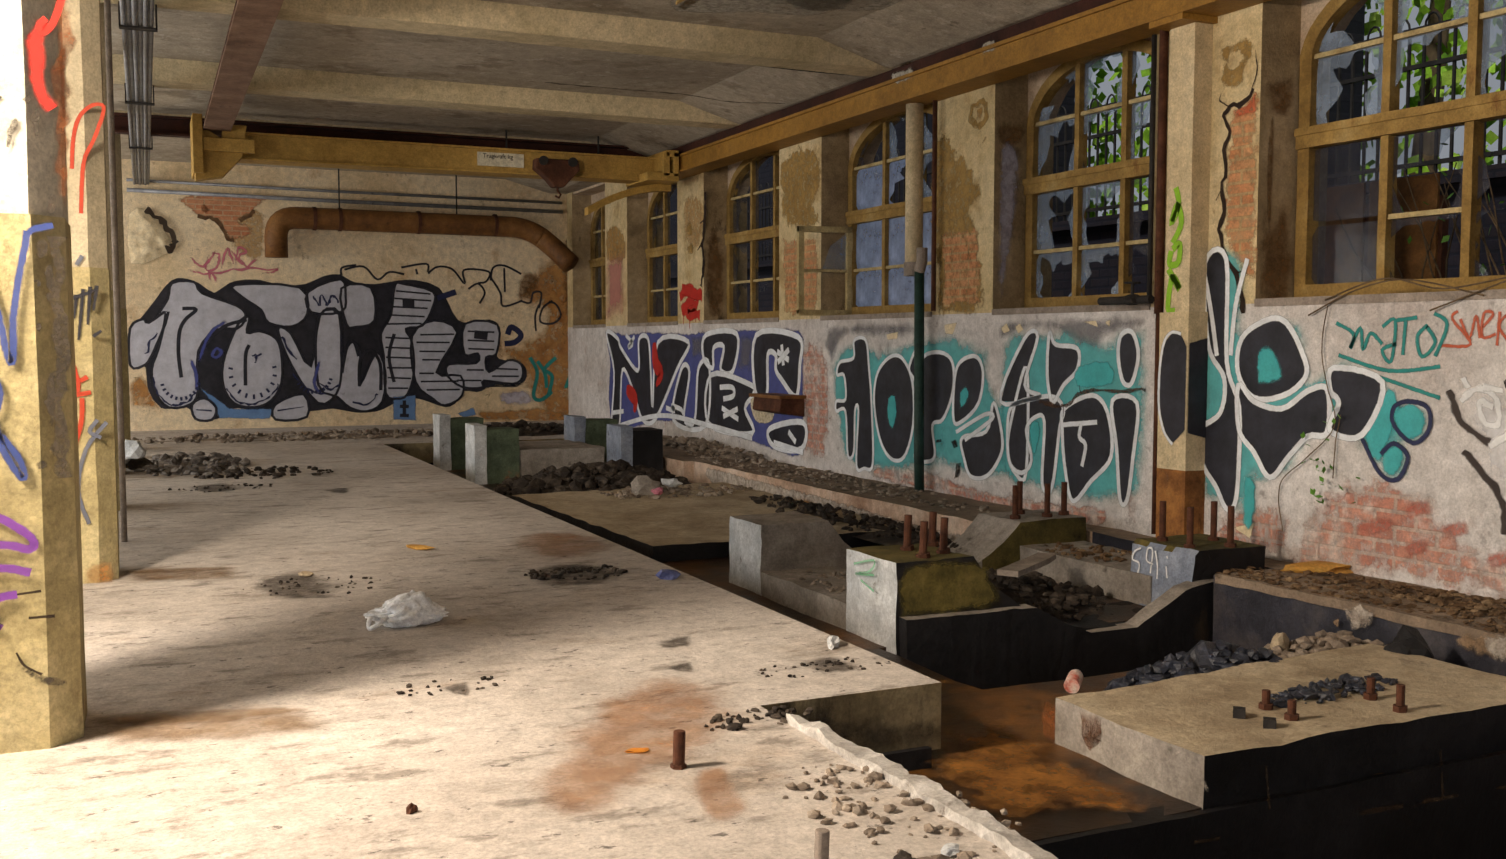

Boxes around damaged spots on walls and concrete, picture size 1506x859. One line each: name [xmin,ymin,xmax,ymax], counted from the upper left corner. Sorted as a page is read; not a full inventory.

spalling [181,196,264,242]
peeling [930,136,984,334]
crack [1216,58,1258,314]
spalling [1225,92,1260,278]
corrosion [479,263,569,421]
spalling [1217,479,1506,599]
corrosion [944,724,1129,810]